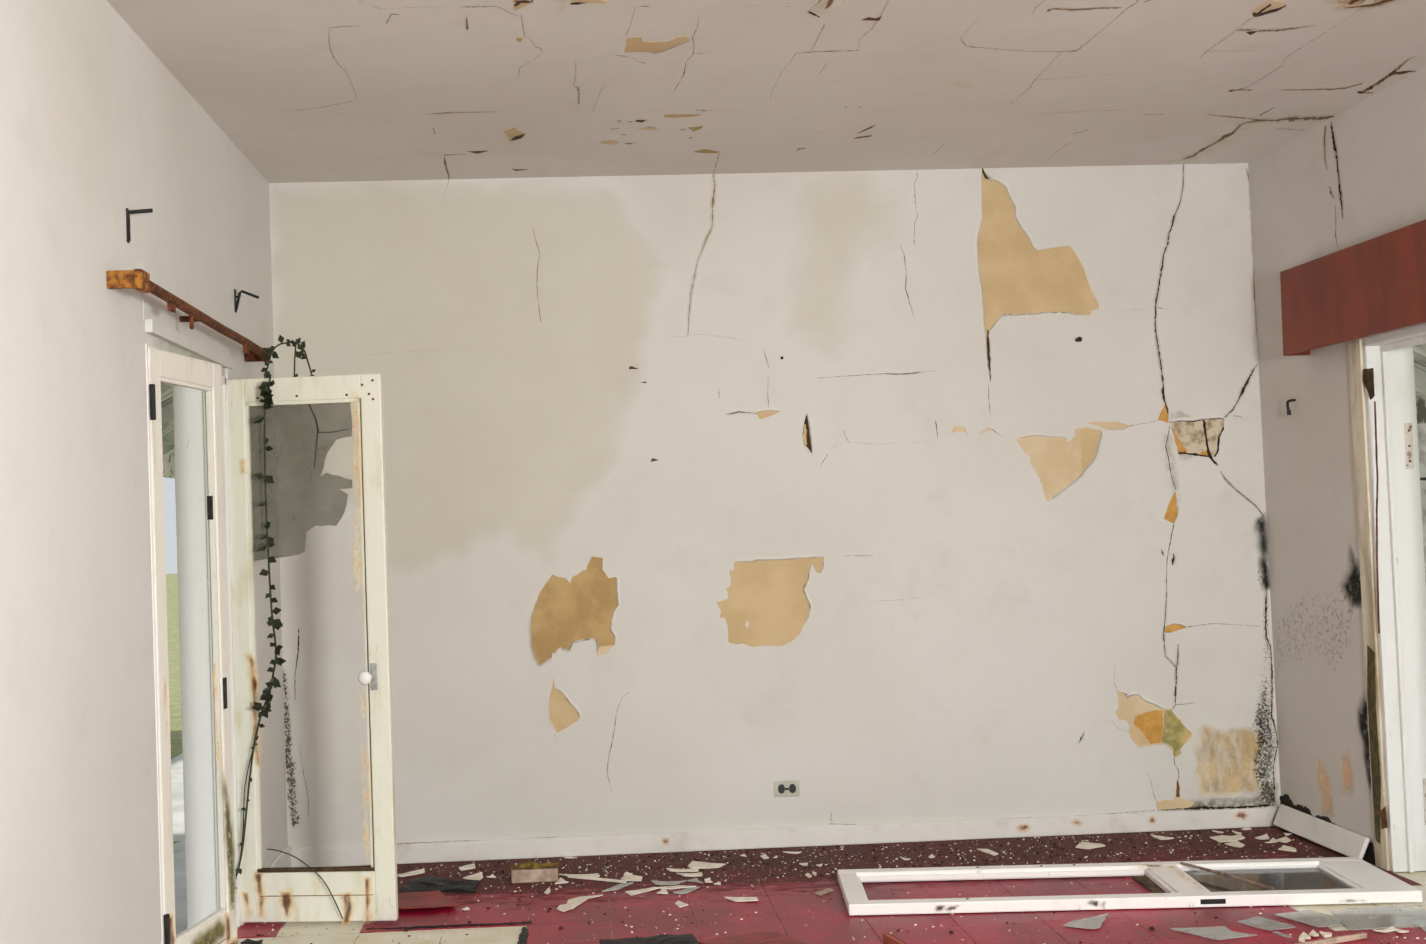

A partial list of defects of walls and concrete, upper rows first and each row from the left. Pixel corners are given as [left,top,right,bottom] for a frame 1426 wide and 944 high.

crack [432,112,479,180]
crack [962,0,1164,157]
peeling [1337,0,1397,9]
crack [668,150,769,414]
peeling [974,168,1099,384]
crack [1100,8,1416,489]
peeling [951,422,1131,502]
flaking render [1158,403,1227,464]
peeling [527,557,621,733]
peeling [716,554,826,647]
crack [1163,524,1278,802]
water stain [1257,518,1270,587]